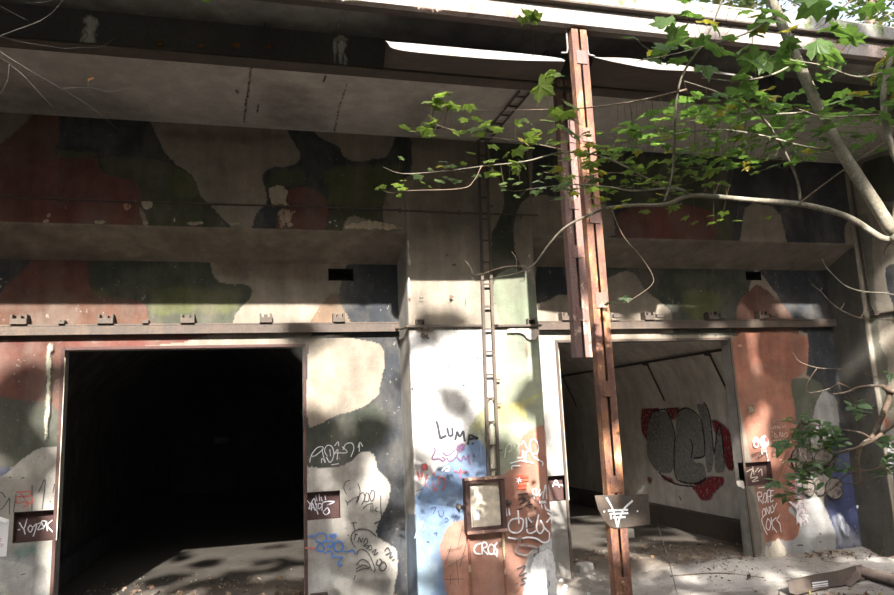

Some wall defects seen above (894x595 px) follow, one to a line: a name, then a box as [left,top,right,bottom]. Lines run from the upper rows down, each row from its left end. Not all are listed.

crack [236,68,259,123]
peeling [268,185,295,229]